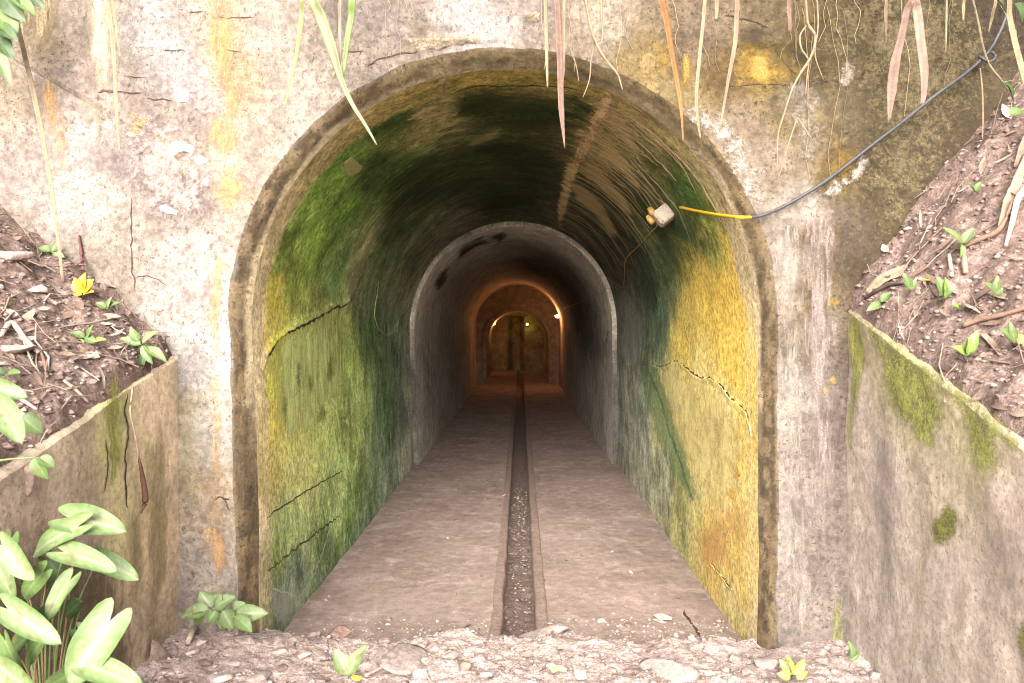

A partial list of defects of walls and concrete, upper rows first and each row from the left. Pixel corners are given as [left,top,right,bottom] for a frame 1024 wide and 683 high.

leakage [558,106,721,267]
leakage [688,107,764,204]
crack [130,198,167,289]
crack [260,276,363,372]
leakage [805,222,833,474]
crack [649,360,751,438]
crack [105,393,129,508]
leakage [234,406,257,525]
crack [268,471,343,518]
crack [267,516,339,571]